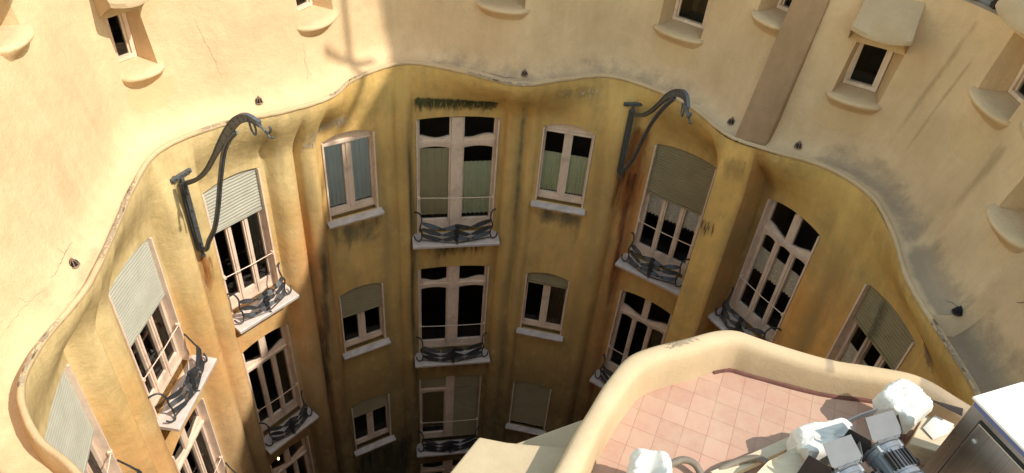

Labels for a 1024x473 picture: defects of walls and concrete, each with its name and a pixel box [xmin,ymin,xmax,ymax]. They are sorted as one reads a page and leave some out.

corrosion [612,128,648,212]